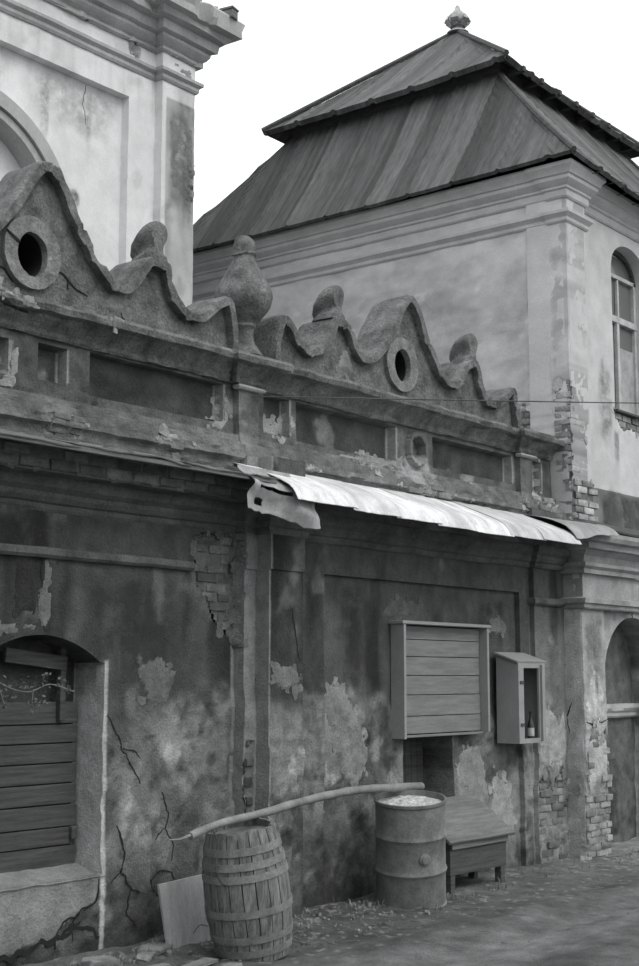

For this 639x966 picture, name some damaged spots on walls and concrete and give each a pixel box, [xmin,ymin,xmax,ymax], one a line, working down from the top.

flaking render [0,347,19,388]
flaking render [0,411,264,502]
flaking render [205,395,233,431]
flaking render [519,378,599,522]
flaking render [612,408,639,438]
crack [107,714,141,784]
flaking render [539,659,613,864]
crack [0,792,175,963]